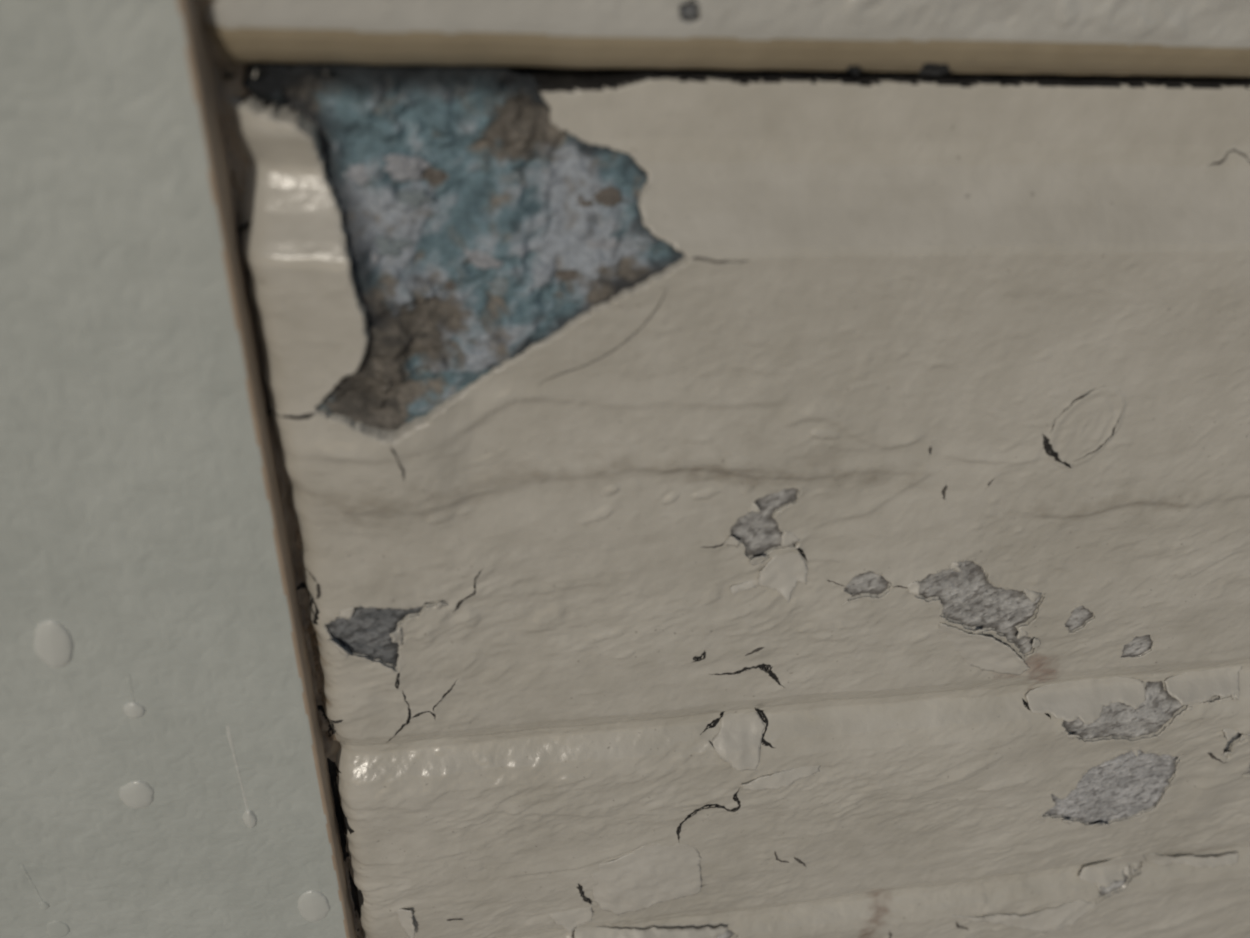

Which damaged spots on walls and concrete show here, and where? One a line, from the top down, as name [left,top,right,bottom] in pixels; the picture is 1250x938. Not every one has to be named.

peeling [242,63,692,431]
crack [1042,385,1124,468]
peeling [725,486,808,602]
peeling [321,598,449,674]
crack [453,568,484,612]
peeling [839,558,1048,675]
peeling [1118,633,1156,660]
crack [386,673,458,743]
peeling [1025,666,1242,828]
crack [676,790,741,842]
peeling [549,907,741,938]